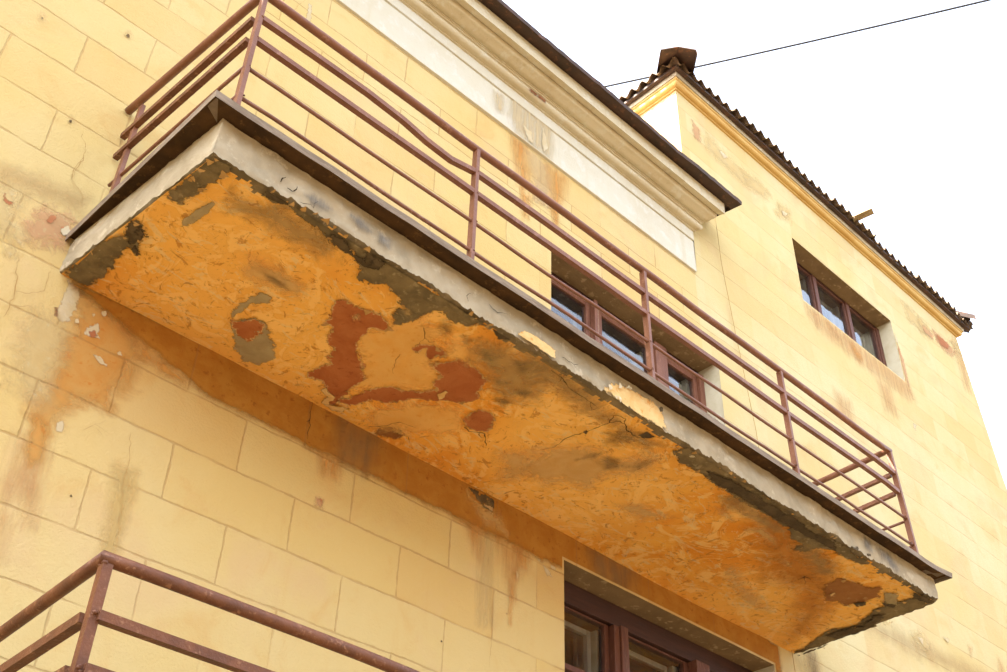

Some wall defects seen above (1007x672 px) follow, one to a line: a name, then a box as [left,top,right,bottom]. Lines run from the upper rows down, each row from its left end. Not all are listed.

water stain [181,202,215,227]
spalling [54,220,149,339]
peeling [230,318,276,365]
peeling [261,189,556,432]
peeling [604,383,669,438]
water stain [22,284,781,672]
water stain [723,496,830,628]
spalling [794,578,934,656]